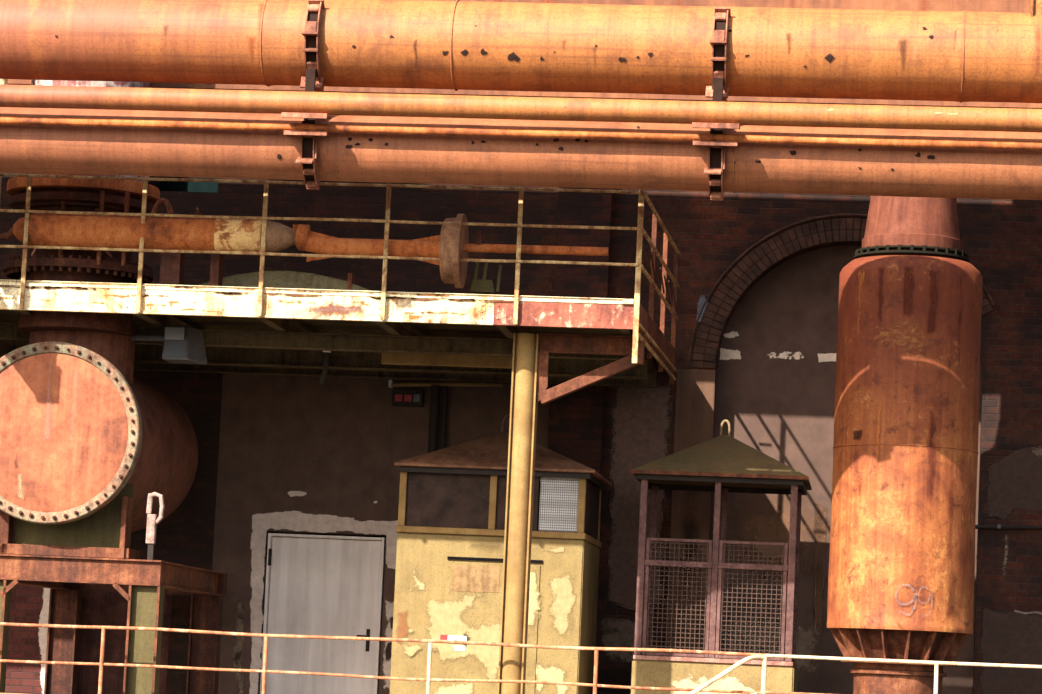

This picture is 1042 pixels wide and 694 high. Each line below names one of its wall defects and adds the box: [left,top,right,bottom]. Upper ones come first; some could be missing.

rust [0,285,219,312]
rust [213,289,522,318]
rust [904,267,914,314]
peeling [720,331,741,360]
peeling [767,351,804,360]
peeling [818,353,836,362]
peeling [528,572,577,635]
peeling [383,569,500,688]
peeling [435,682,473,694]
peeling [536,663,569,694]
peeling [671,673,755,694]